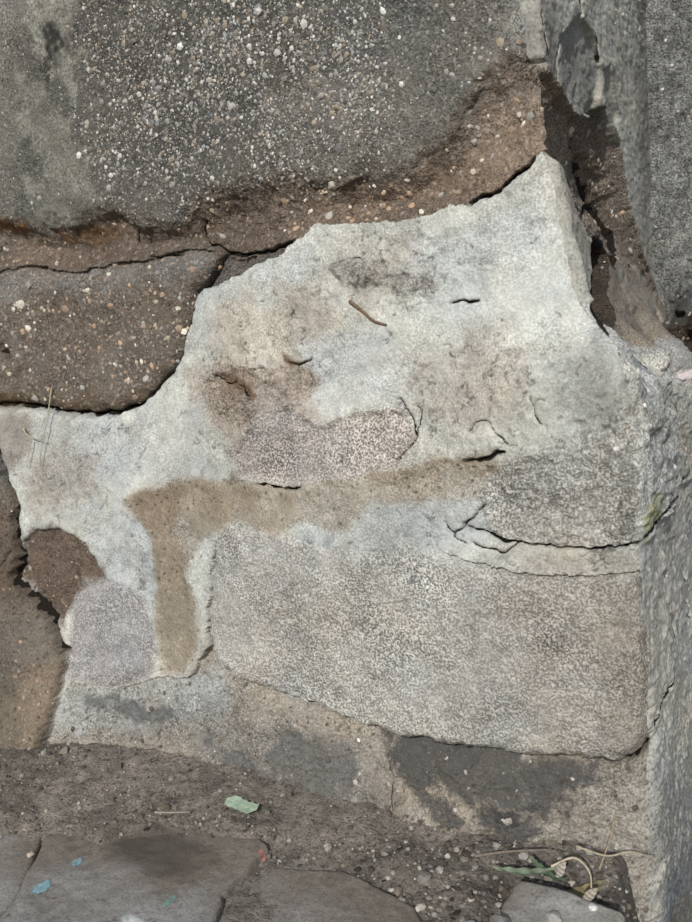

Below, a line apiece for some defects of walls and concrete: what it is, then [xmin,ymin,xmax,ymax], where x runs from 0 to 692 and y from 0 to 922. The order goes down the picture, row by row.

spalling [0,11,657,409]
spalling [200,364,323,428]
crack [447,478,684,553]